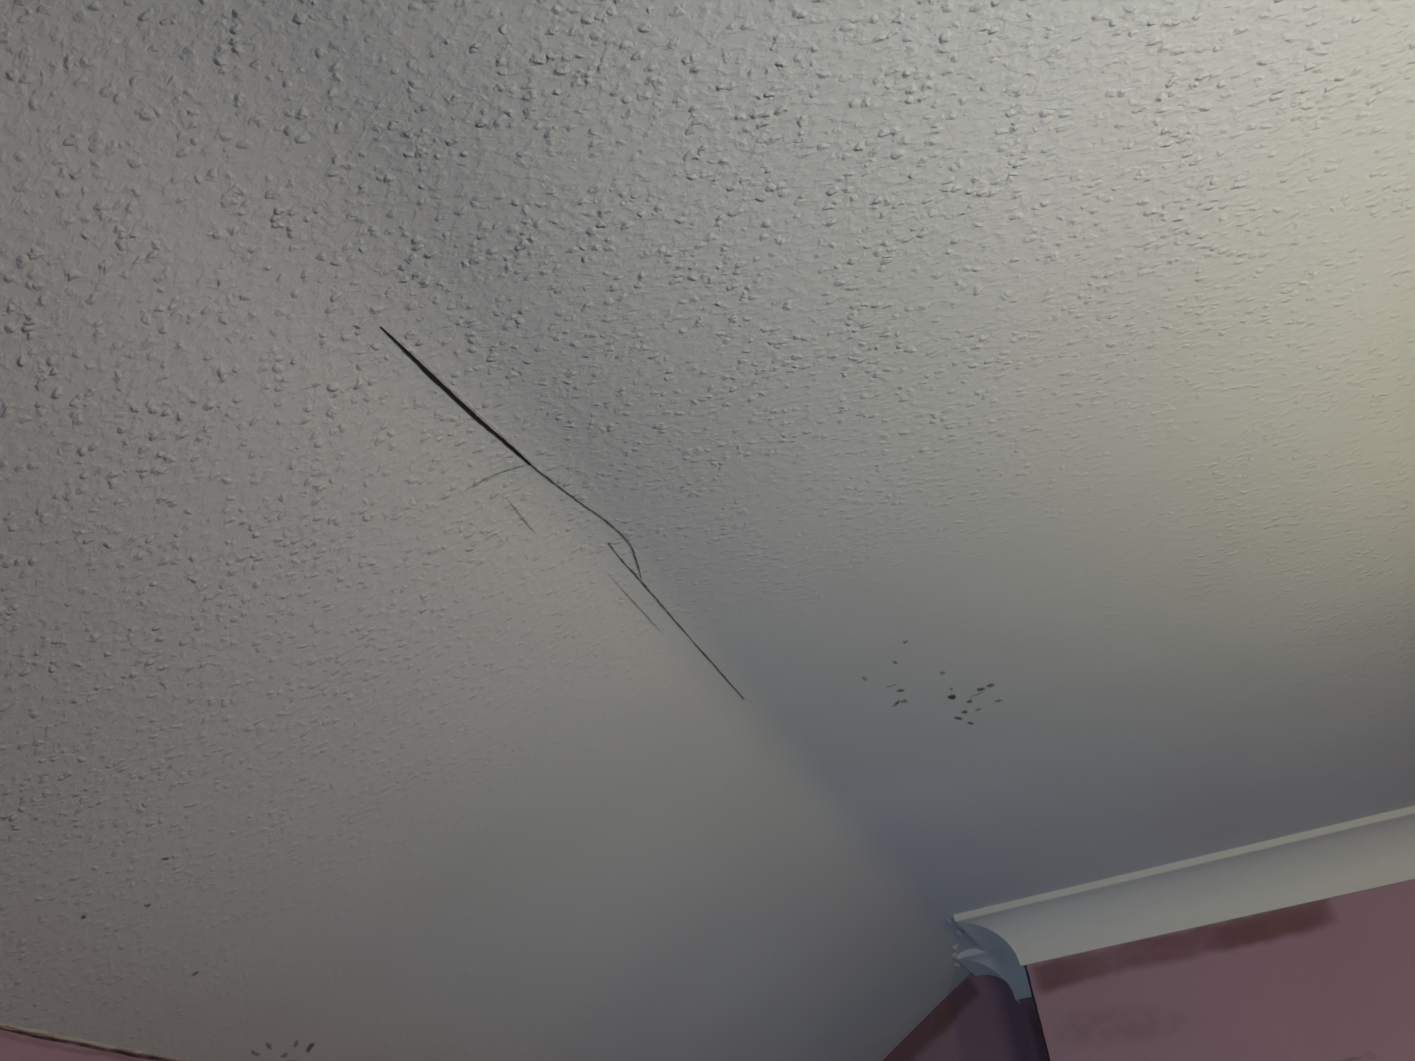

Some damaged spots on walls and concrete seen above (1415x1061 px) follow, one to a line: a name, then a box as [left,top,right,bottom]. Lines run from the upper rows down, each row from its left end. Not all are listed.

crack [381,327,745,700]